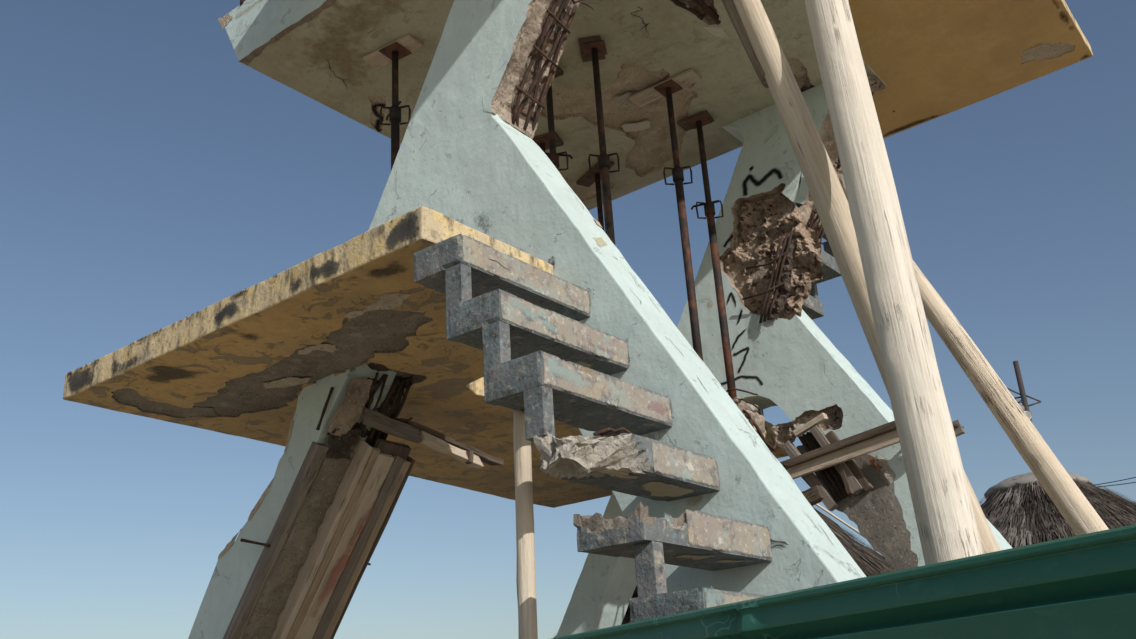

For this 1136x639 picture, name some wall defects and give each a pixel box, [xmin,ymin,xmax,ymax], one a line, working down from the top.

spalling [671,0,721,24]
spalling [482,0,697,174]
spalling [814,96,843,180]
spalling [722,173,825,323]
water stain [215,301,237,325]
water stain [147,367,196,383]
spalling [726,388,842,452]
spalling [819,466,848,501]